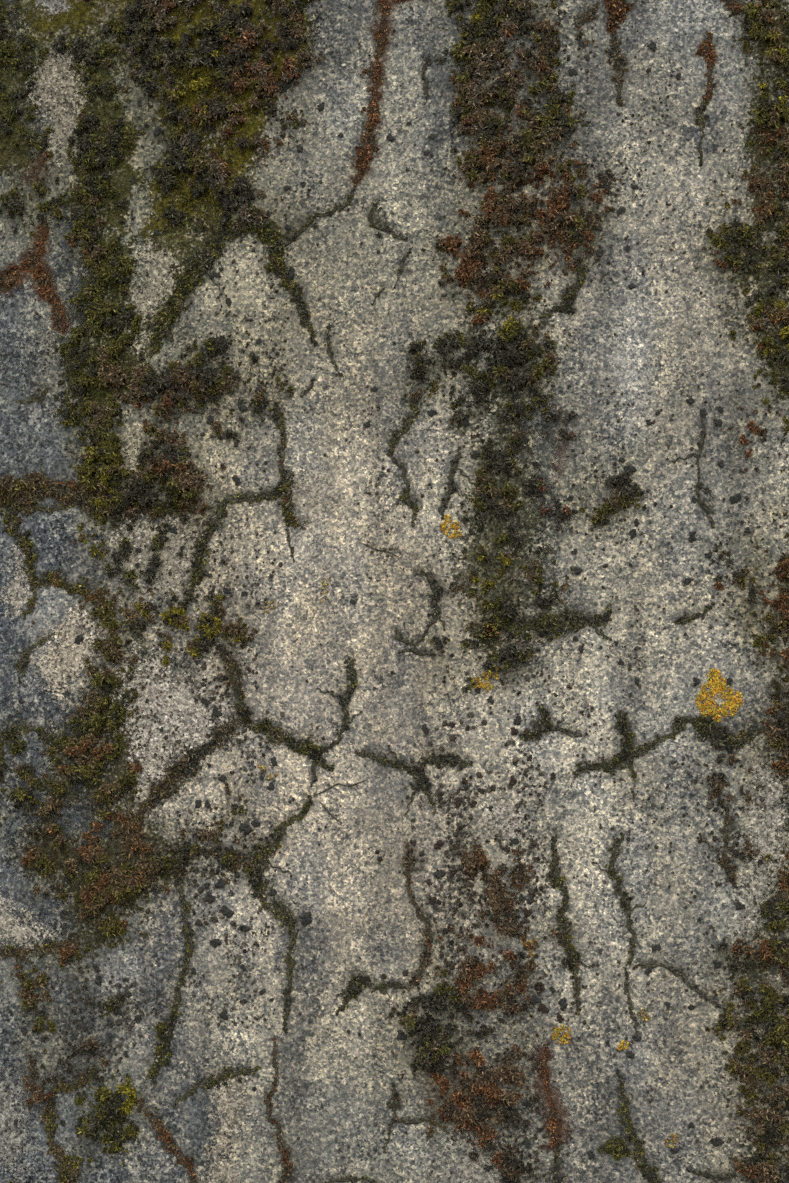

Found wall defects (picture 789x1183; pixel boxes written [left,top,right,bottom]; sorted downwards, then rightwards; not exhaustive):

crack [575,0,635,107]
crack [695,0,744,167]
water stain [0,196,93,484]
crack [0,0,414,684]
crack [540,265,587,319]
crack [387,391,477,523]
water stain [515,386,572,594]
crack [361,542,612,659]
crack [521,703,781,783]
crack [134,644,473,1183]
crack [547,832,727,1035]
crack [598,1070,734,1183]